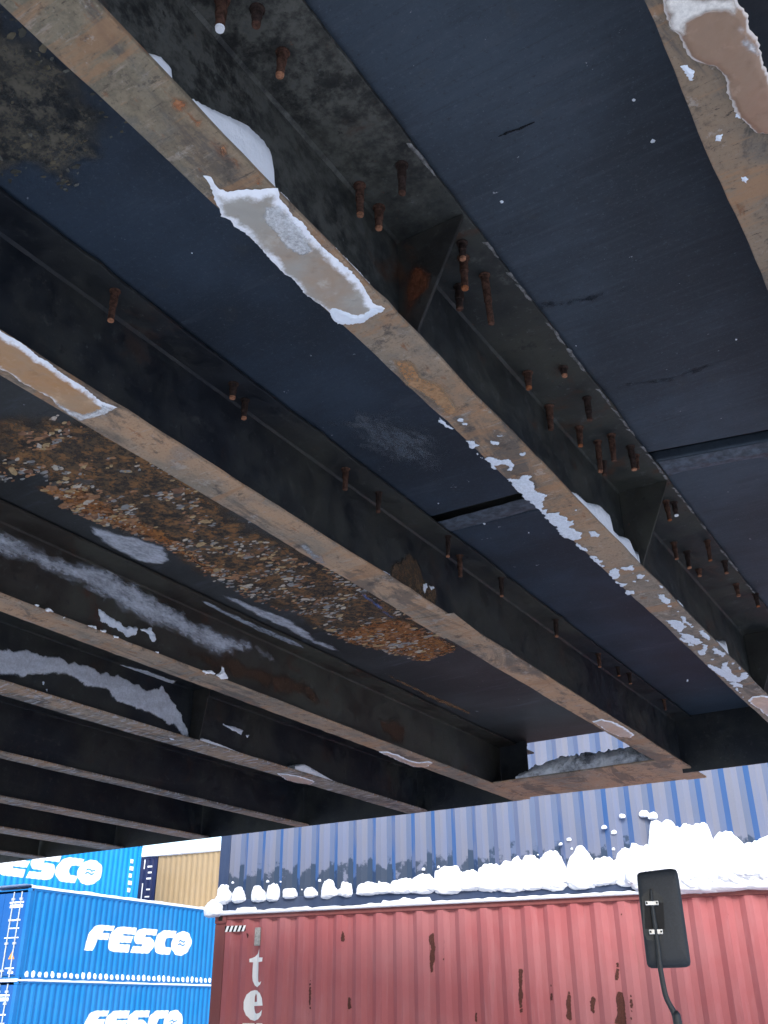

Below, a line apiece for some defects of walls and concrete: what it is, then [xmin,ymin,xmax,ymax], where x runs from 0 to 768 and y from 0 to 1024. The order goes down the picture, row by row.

crack [499,122,535,136]
rust [0,411,455,661]